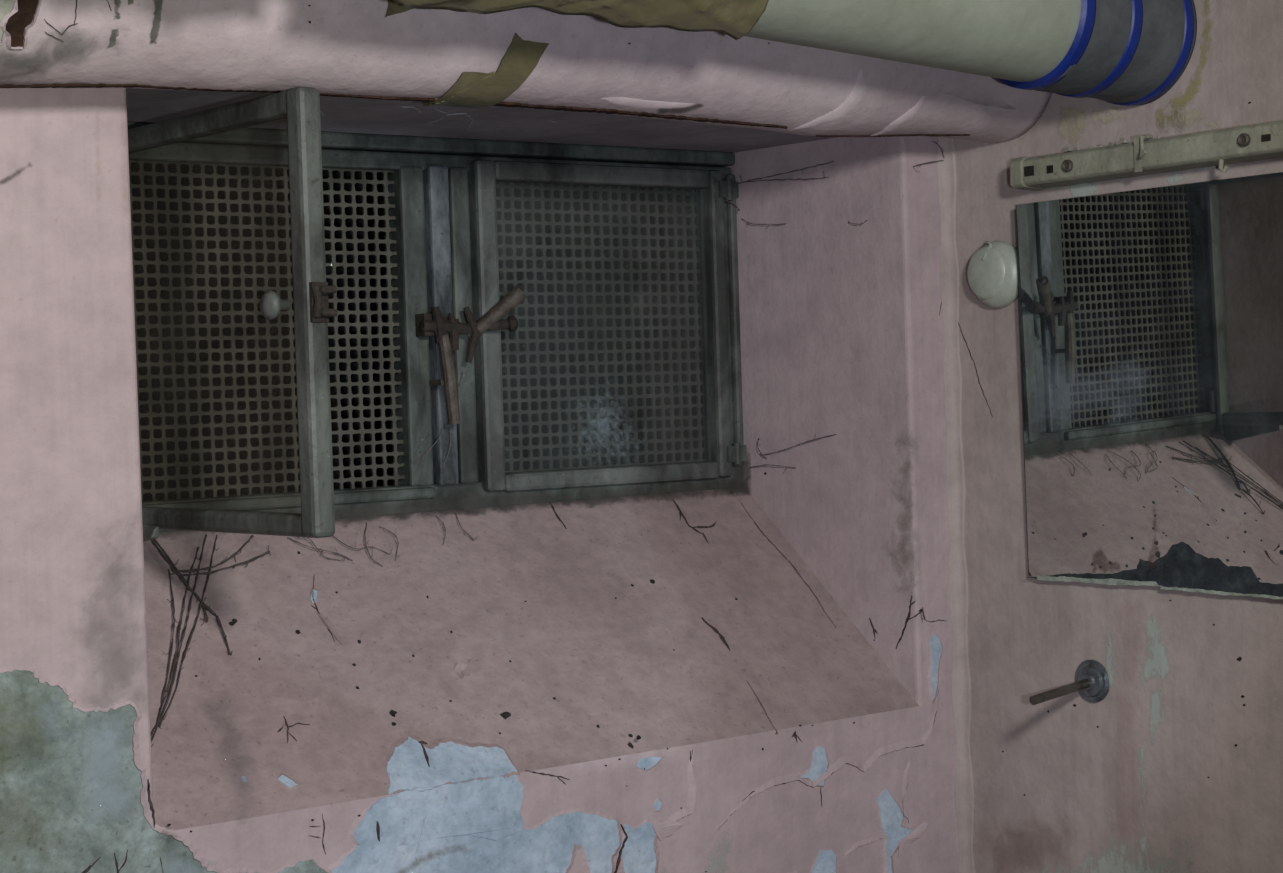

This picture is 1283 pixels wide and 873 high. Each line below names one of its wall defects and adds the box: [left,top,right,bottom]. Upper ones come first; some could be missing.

flaking render [0,0,42,50]
flaking render [0,665,696,873]
peeling [788,848,848,873]
peeling [877,779,929,873]